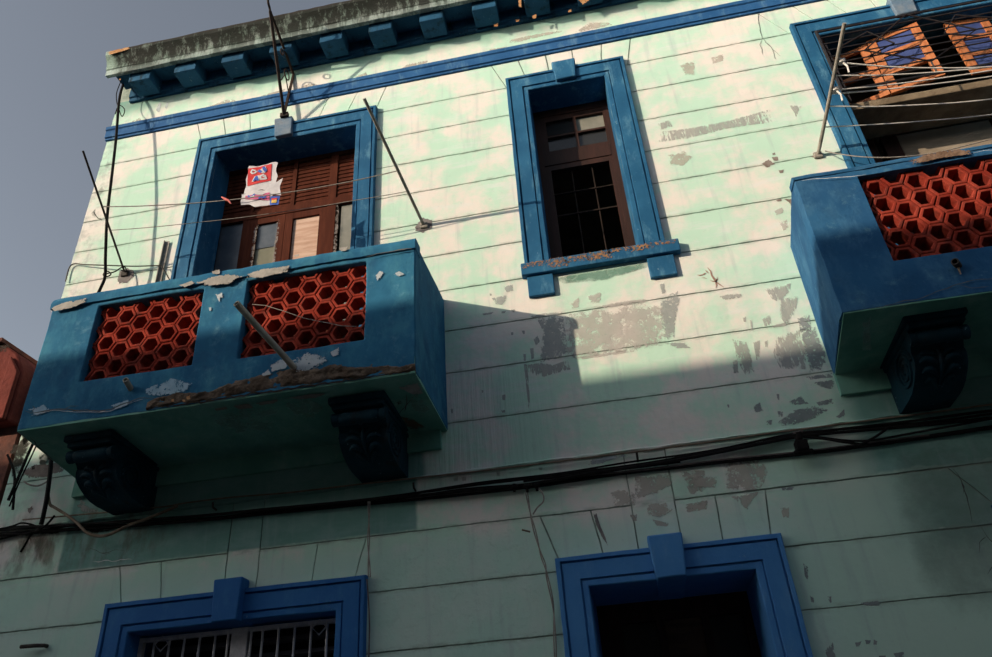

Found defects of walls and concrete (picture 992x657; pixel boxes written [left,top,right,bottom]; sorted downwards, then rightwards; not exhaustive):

peeling [660,110,768,142]
peeling [670,152,691,165]
flaking render [51,298,86,312]
spalling [145,347,416,412]
peeling [511,284,690,408]
peeling [733,283,833,425]
peeling [683,461,766,512]